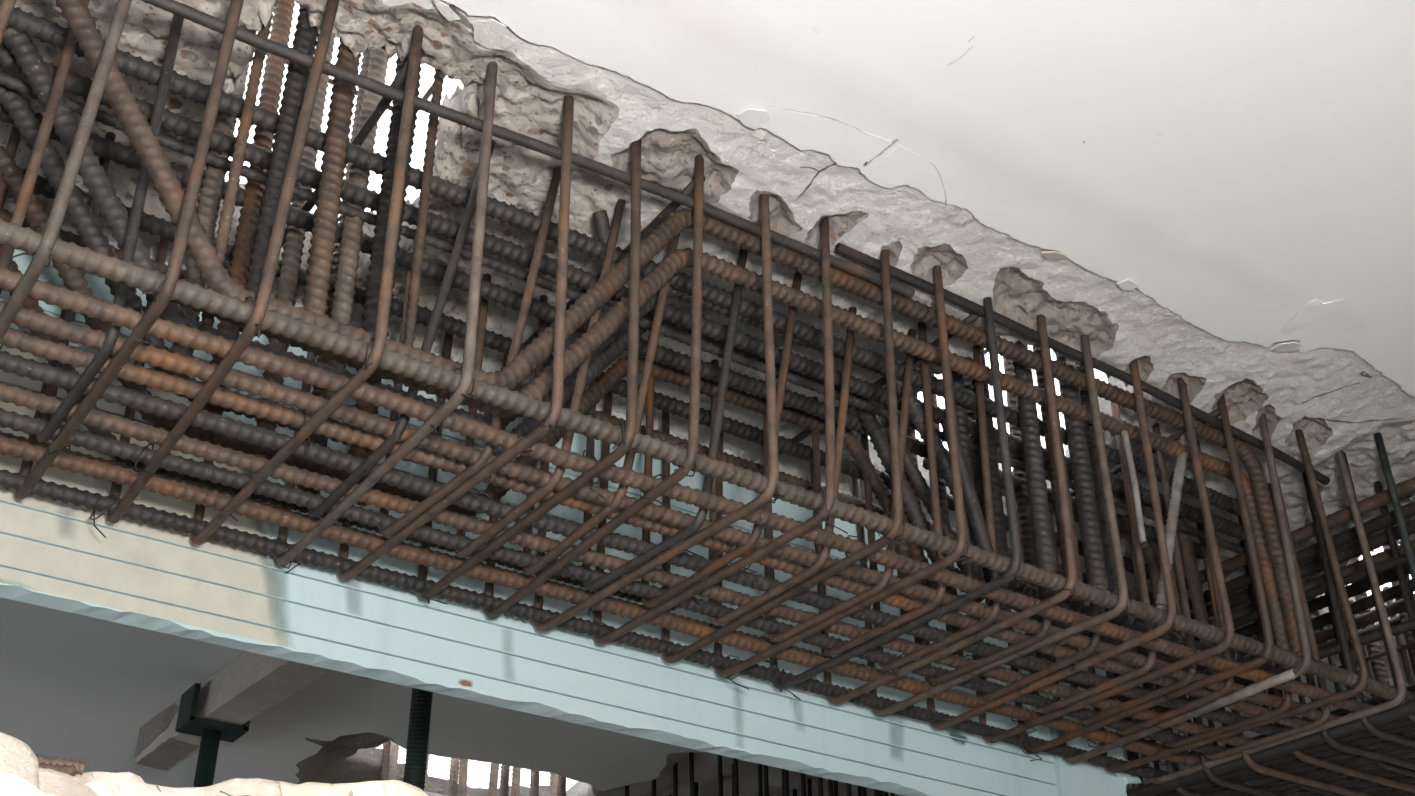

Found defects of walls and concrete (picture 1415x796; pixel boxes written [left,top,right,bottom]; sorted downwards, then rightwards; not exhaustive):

spalling [0,0,68,28]
spalling [0,120,46,177]
spalling [62,91,135,149]
crack [769,106,947,206]
spalling [37,195,77,229]
leakage [0,344,48,364]
spalling [88,0,1415,660]
leakage [0,369,112,460]
leakage [75,367,250,476]
leakage [0,454,286,647]
spalling [1307,580,1415,704]
spalling [0,732,904,796]